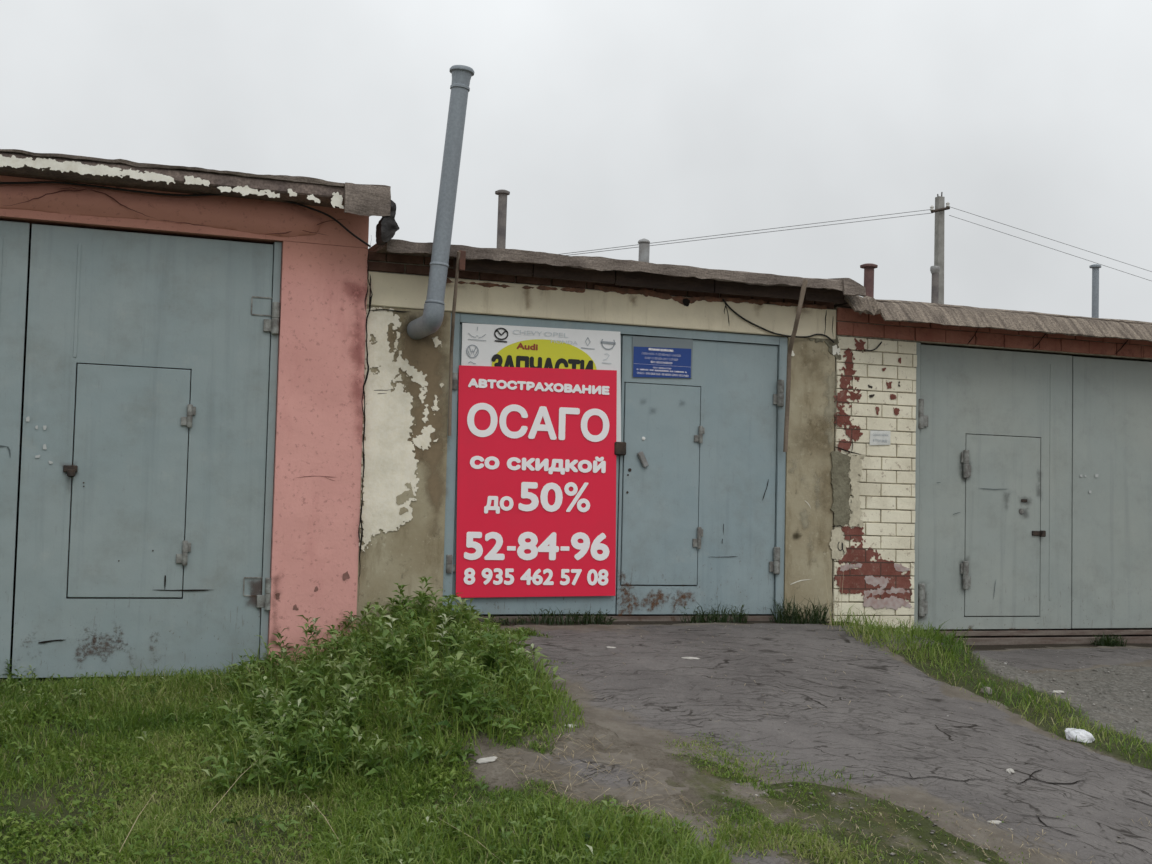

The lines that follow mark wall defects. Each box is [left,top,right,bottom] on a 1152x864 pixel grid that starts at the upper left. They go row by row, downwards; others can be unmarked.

peeling [0,154,344,209]
peeling [359,305,444,552]
peeling [809,336,900,453]
rust [618,575,693,619]
peeling [829,526,912,610]